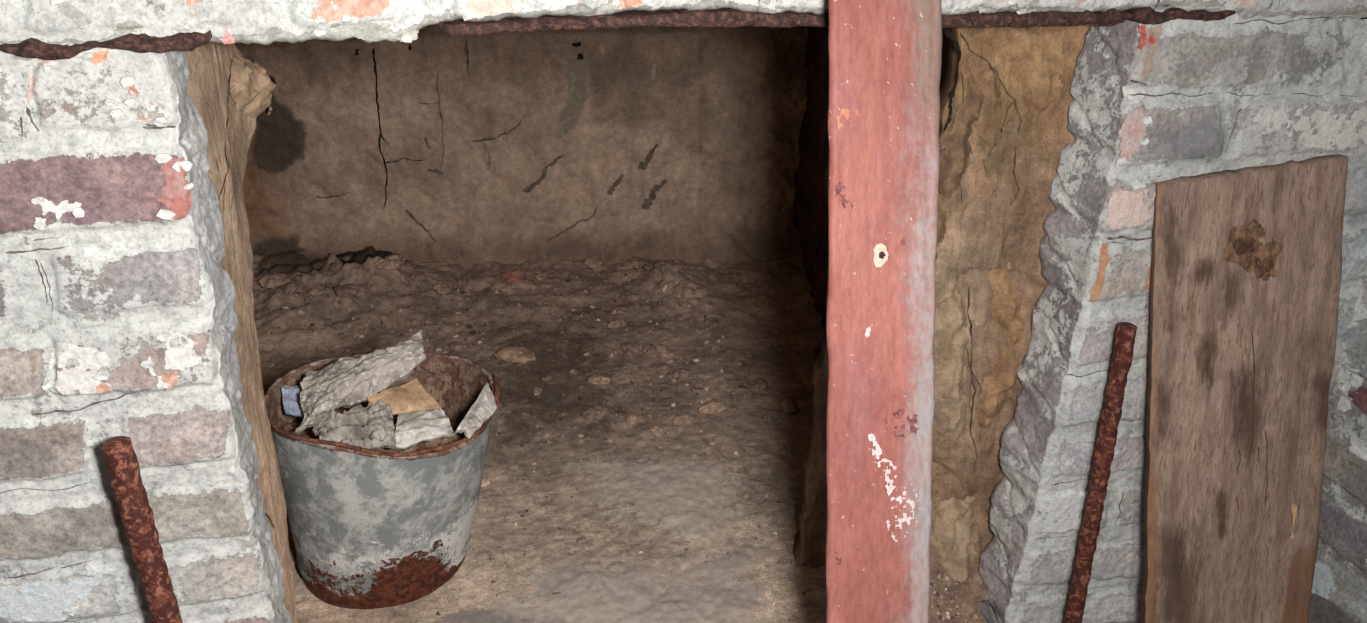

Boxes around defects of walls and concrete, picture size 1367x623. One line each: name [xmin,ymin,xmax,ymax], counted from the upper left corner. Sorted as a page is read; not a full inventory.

water stain [254,95,305,180]
crack [372,42,469,207]